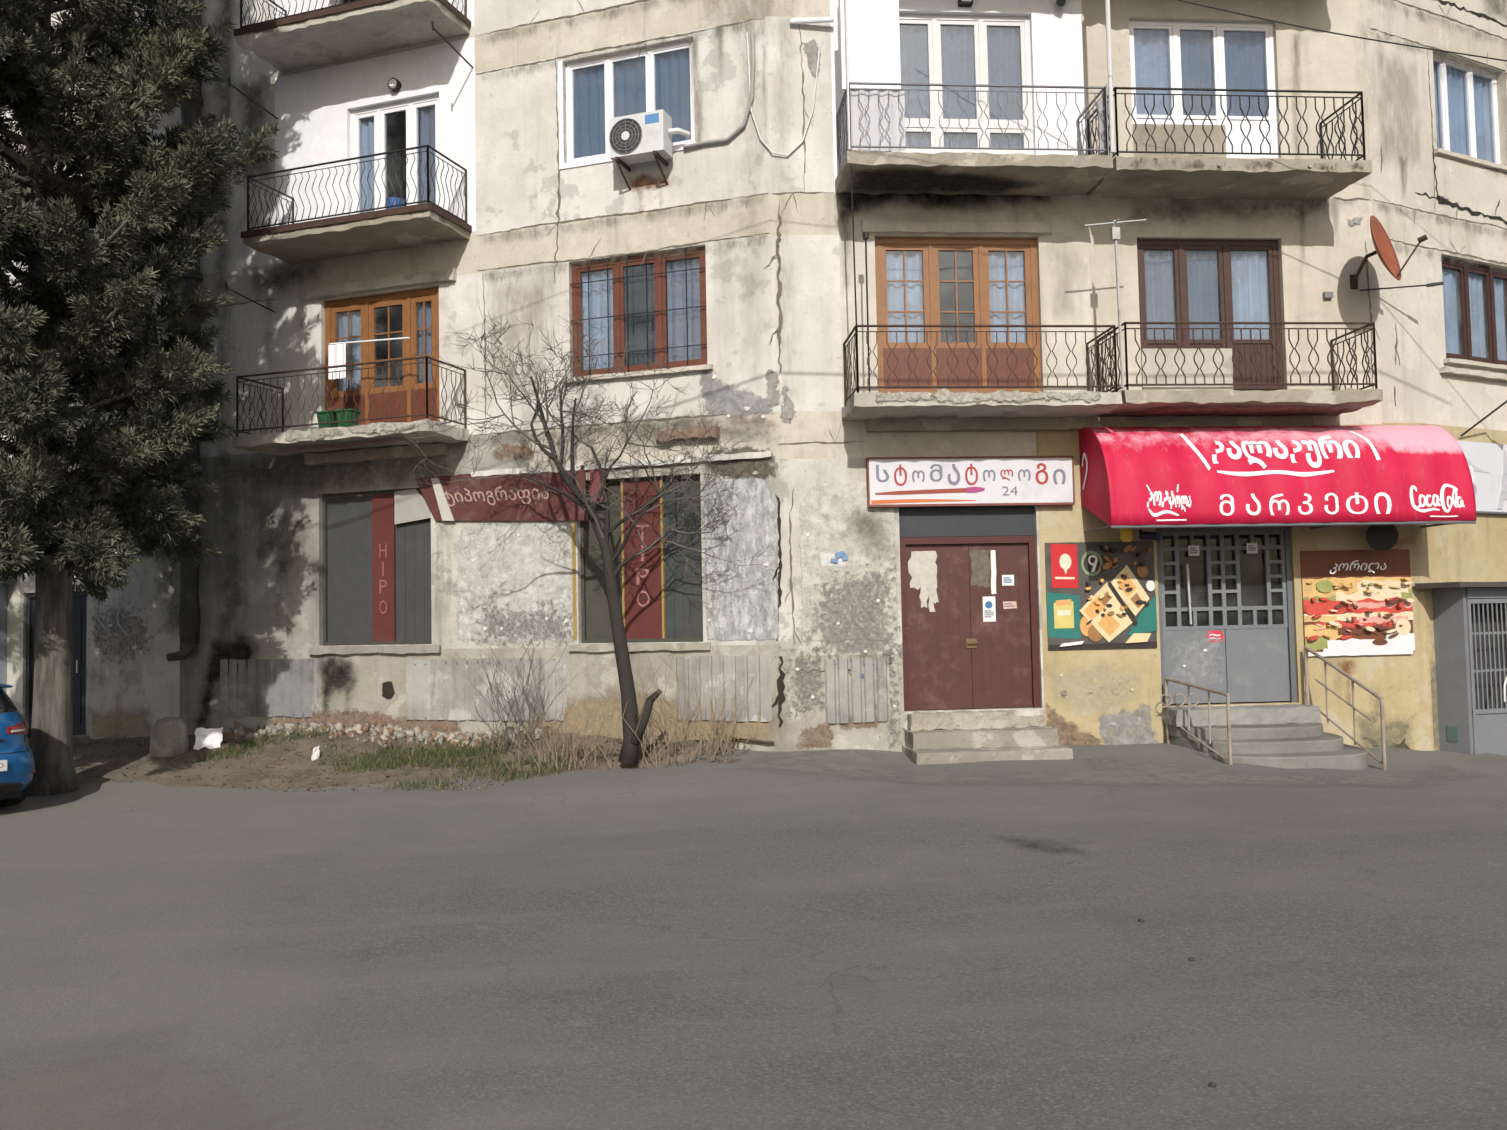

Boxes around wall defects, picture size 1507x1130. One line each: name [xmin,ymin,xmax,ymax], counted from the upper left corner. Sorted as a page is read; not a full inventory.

crack [1333,0,1507,405]
crack [474,0,863,728]
peeling [700,369,795,424]
peeling [704,446,779,641]
peeling [788,564,904,749]